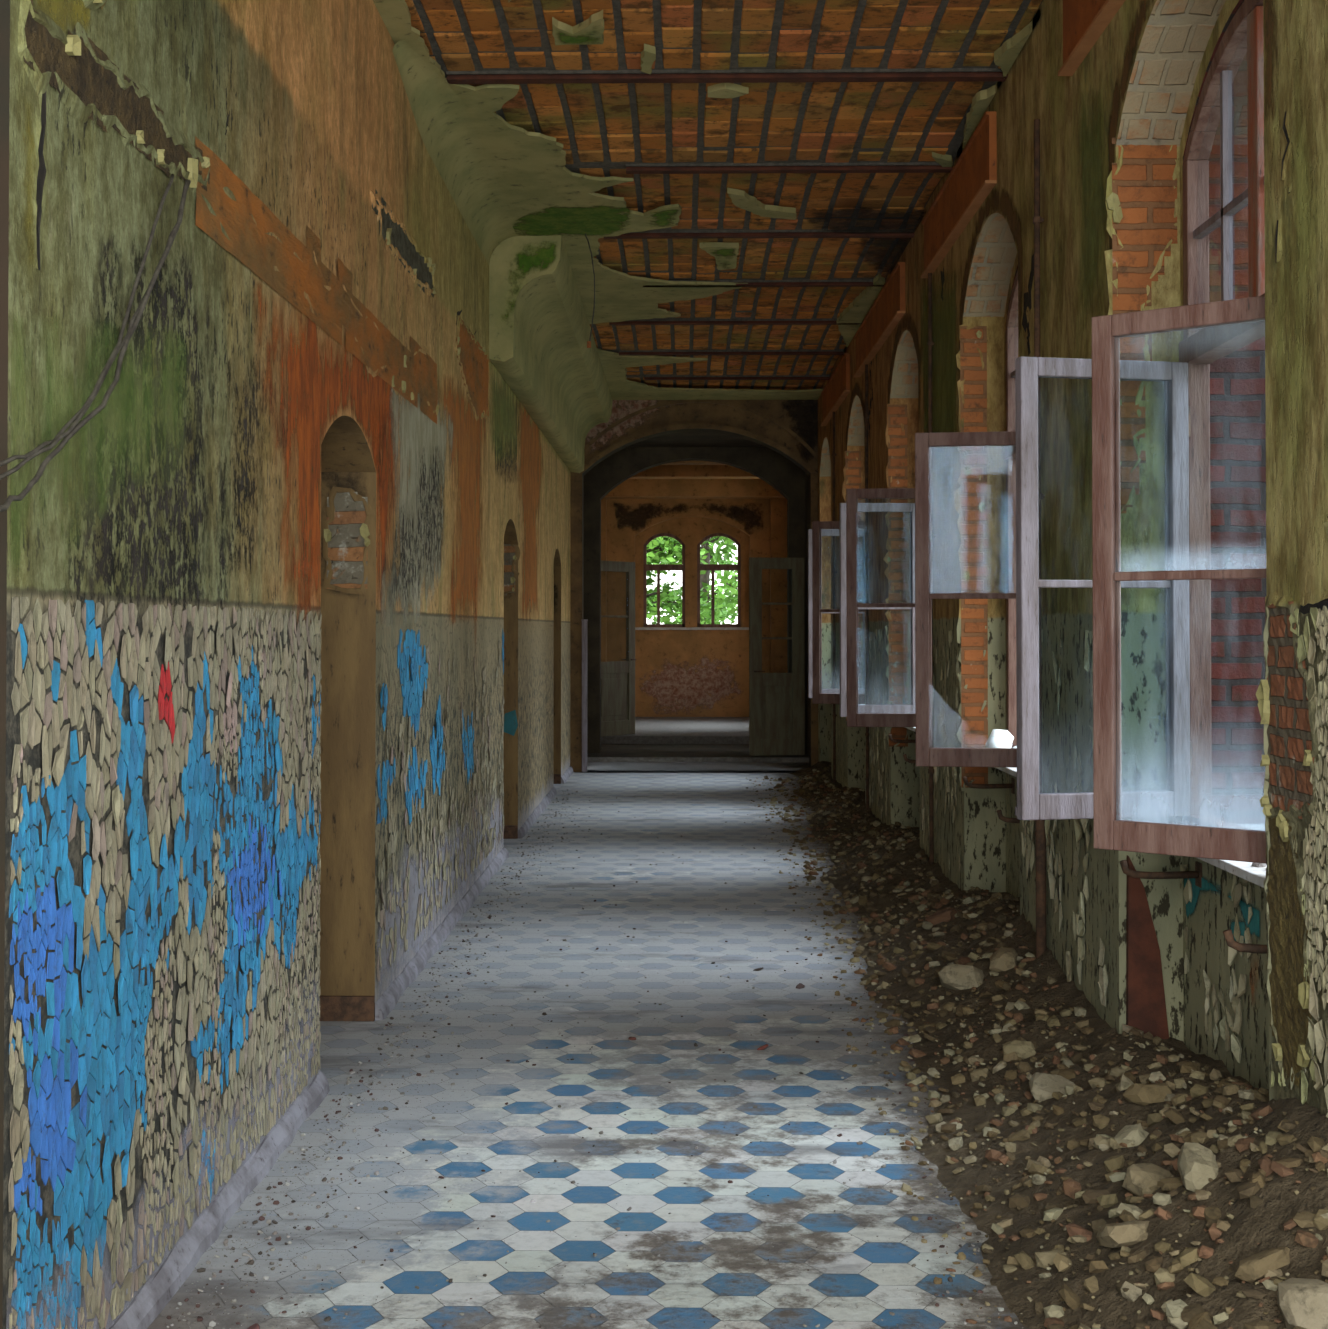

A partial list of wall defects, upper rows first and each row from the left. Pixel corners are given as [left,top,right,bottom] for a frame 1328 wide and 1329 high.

flaking render [18,0,439,424]
flaking render [405,0,1043,449]
leakage [70,239,264,625]
flaking render [321,485,375,595]
leakage [381,388,453,625]
peeling [8,597,322,1329]
peeling [376,629,504,982]
flaking render [922,767,992,844]
flaking render [1021,819,1108,1006]
flaking render [1180,591,1328,1118]